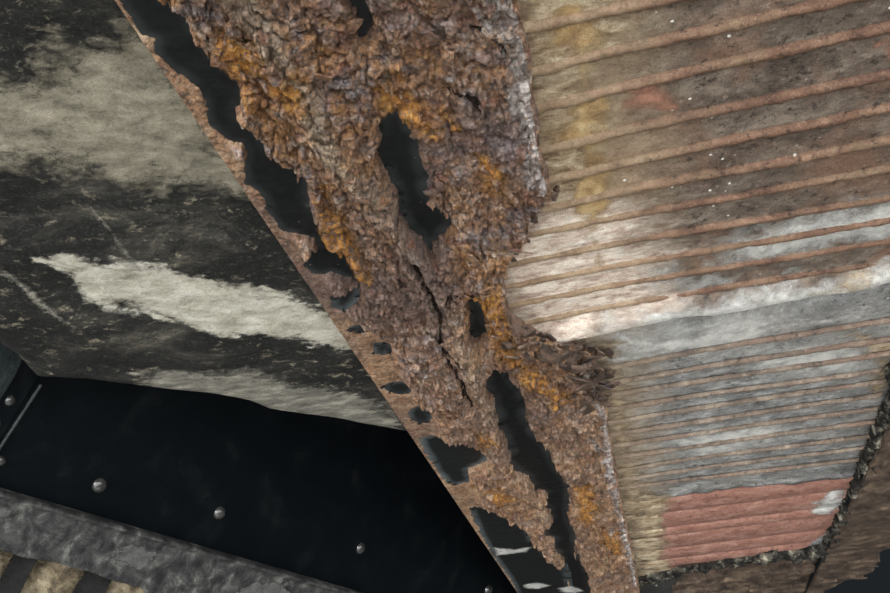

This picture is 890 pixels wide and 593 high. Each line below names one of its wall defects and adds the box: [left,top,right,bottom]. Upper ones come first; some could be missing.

corrosion [215,29,309,118]
corrosion [372,73,461,143]
corrosion [315,184,373,287]
corrosion [465,289,570,411]
spalling [129,367,432,431]
peeling [419,435,497,485]
peeling [458,299,621,593]
corrosion [573,484,622,556]
peeling [235,581,290,593]
peeling [824,548,890,593]